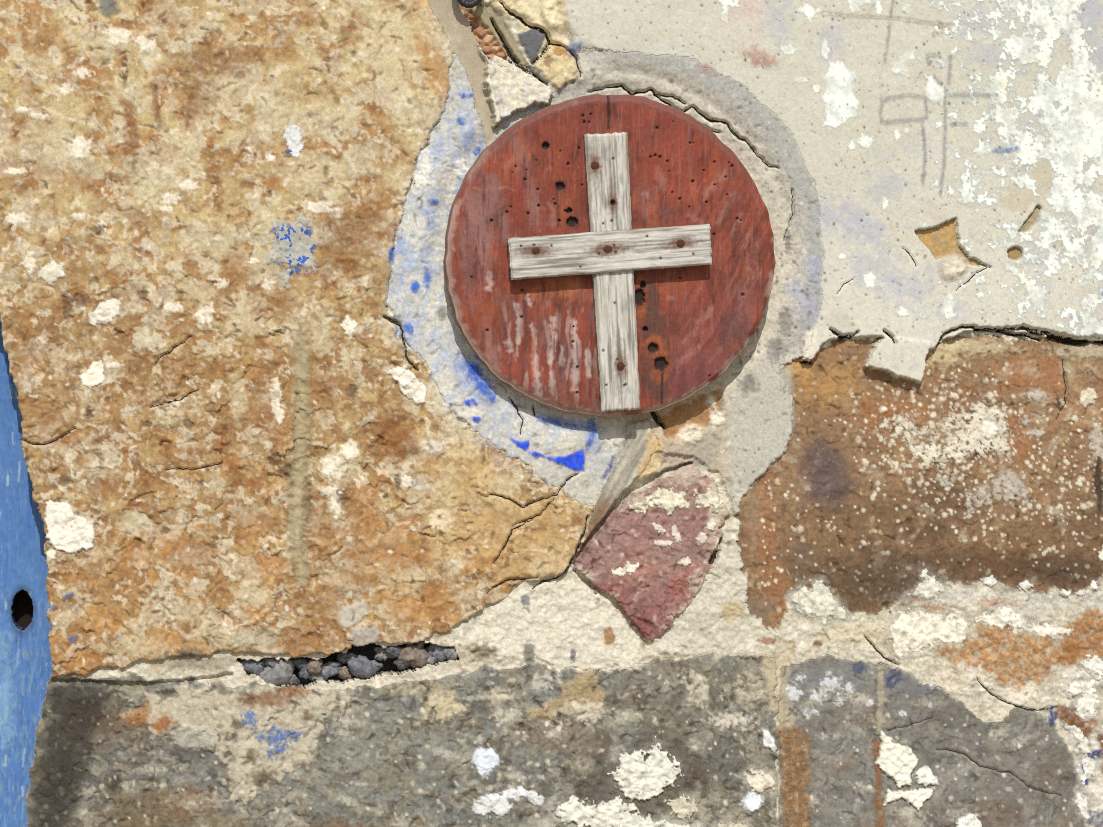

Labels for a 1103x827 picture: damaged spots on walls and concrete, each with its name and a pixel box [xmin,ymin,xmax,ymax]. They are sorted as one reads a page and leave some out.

peeling [718,0,740,24]
peeling [797,3,822,23]
peeling [847,0,882,16]
peeling [794,38,860,128]
crack [491,3,793,241]
peeling [848,133,874,150]
peeling [891,0,1103,341]
peeling [863,272,877,288]
crack [487,473,588,594]
peeling [980,575,998,586]